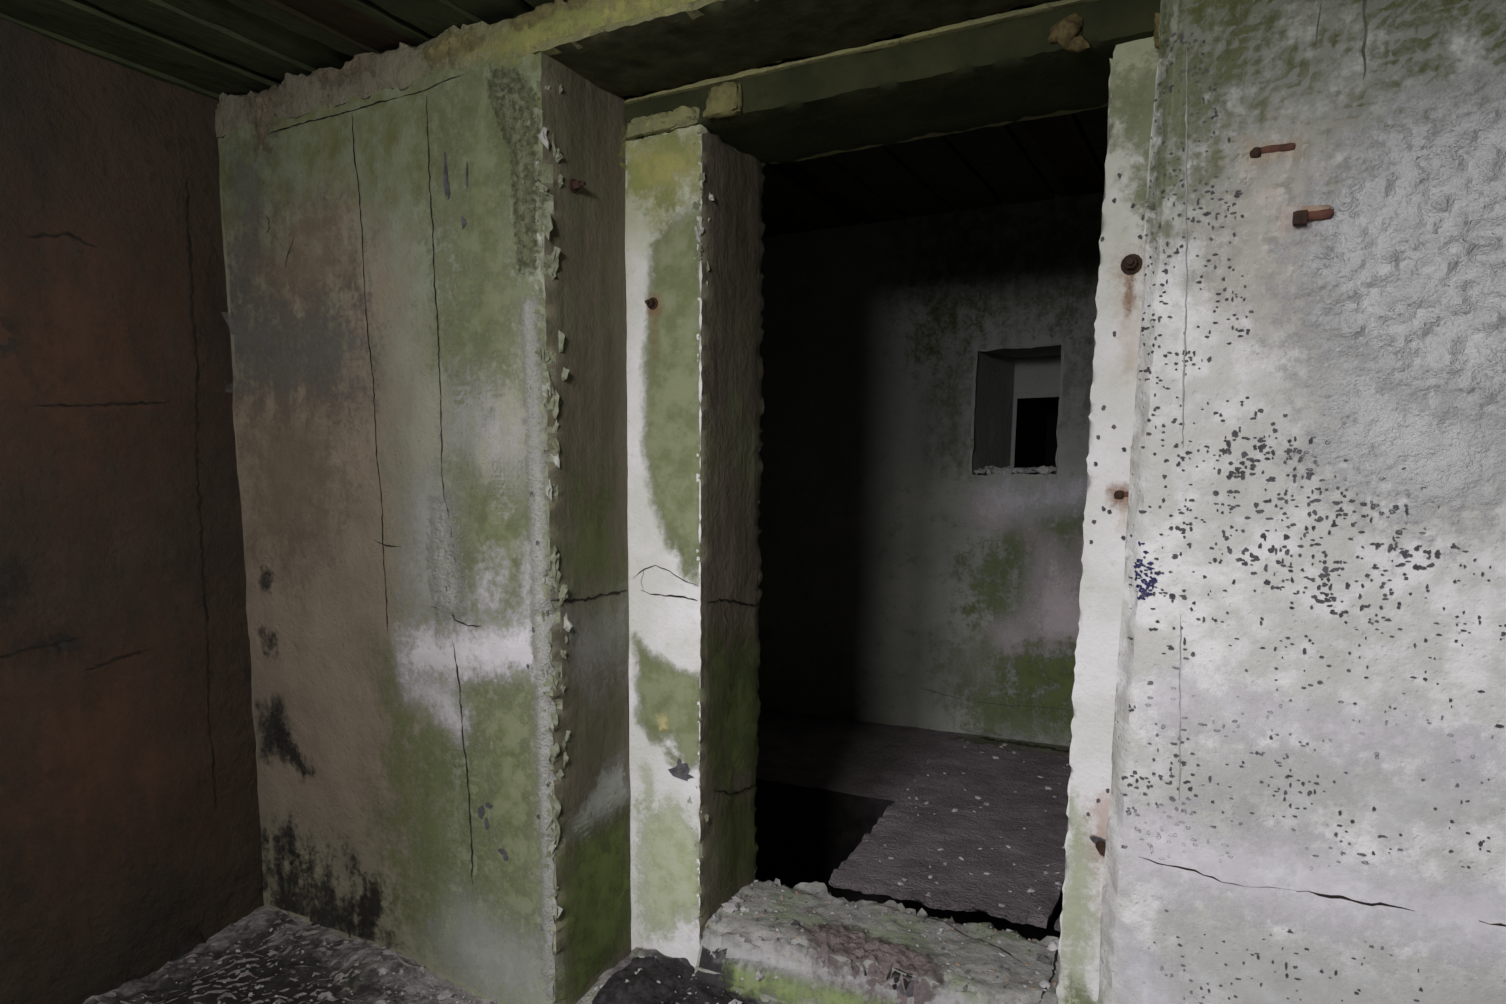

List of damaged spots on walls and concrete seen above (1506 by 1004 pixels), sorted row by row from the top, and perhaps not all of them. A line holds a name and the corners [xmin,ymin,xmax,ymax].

damp [392,377,564,1003]
damp [561,754,652,841]
crack [1140,857,1413,911]